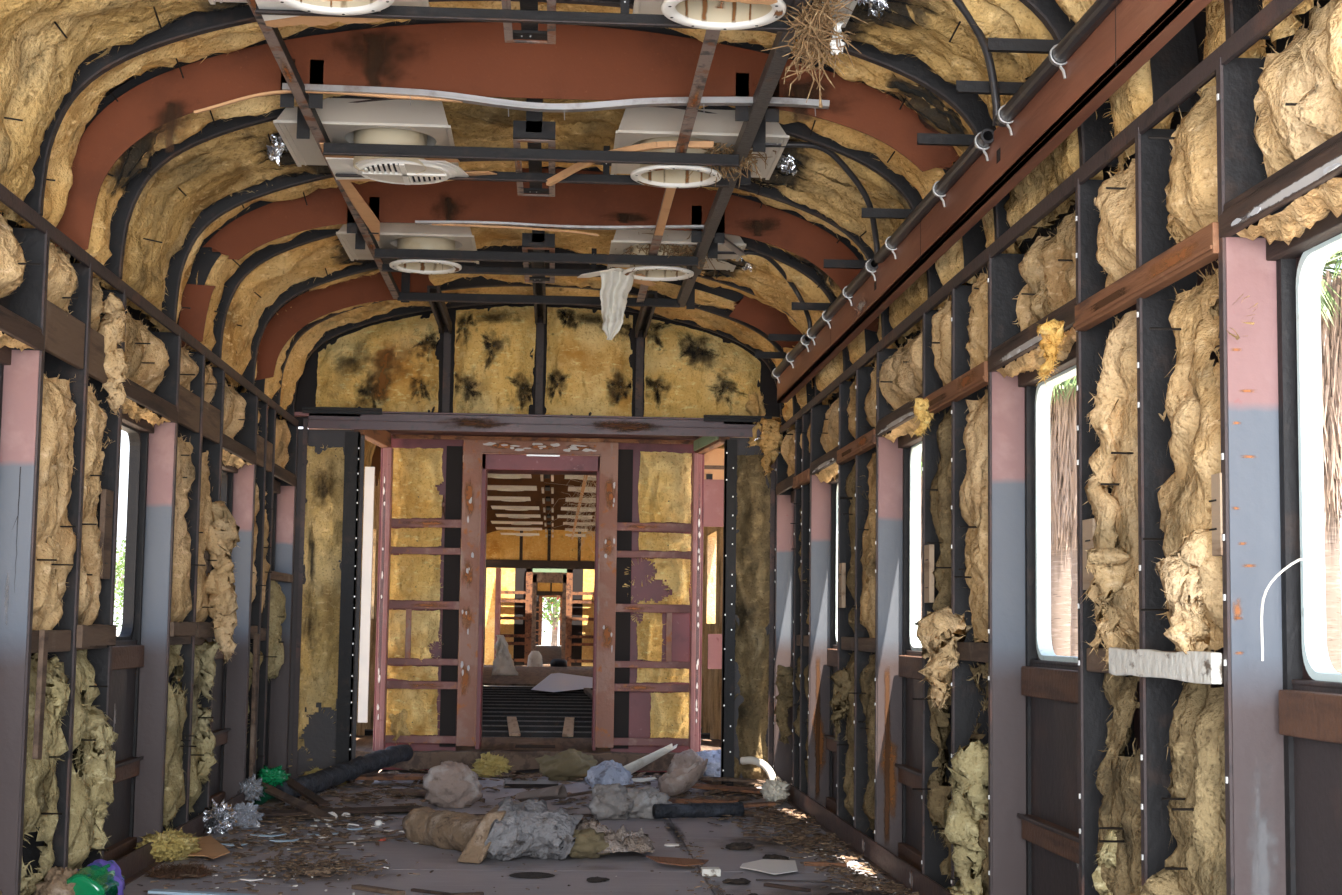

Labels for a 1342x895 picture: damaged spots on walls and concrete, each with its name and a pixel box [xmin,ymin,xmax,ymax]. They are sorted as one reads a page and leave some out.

peeling [1231,155,1342,226]
peeling [1091,287,1126,312]
leakage [456,316,491,368]
peeling [1002,335,1042,362]
leakage [356,349,430,408]
peeling [812,412,913,473]